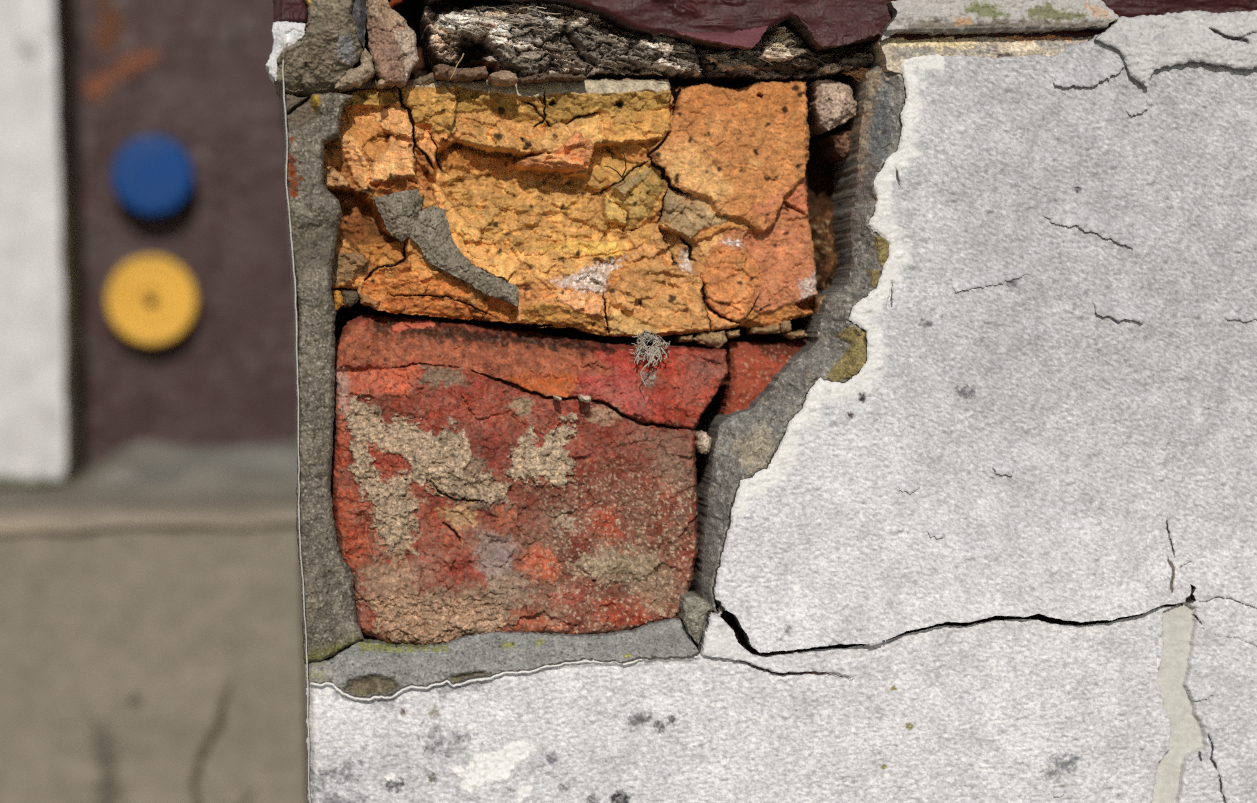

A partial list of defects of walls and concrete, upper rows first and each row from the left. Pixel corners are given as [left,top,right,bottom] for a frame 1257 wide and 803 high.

peeling [266,21,306,83]
crack [399,89,448,174]
crack [522,94,597,127]
crack [590,82,760,335]
crack [365,246,499,319]
spalling [304,0,1257,701]
crack [1162,520,1257,647]
crack [720,610,852,680]
crack [905,614,1104,632]
crack [1199,734,1227,803]